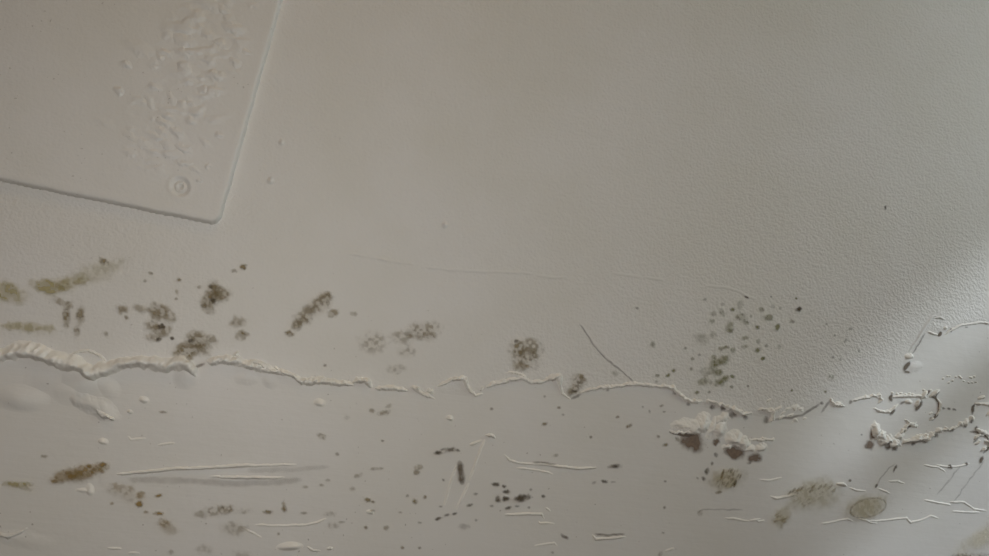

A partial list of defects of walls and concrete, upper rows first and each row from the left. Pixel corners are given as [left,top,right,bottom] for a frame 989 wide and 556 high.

water stain [202,284,228,307]
water stain [149,306,204,358]
water stain [713,346,734,388]
peeling [669,411,775,462]
peeling [865,415,989,463]